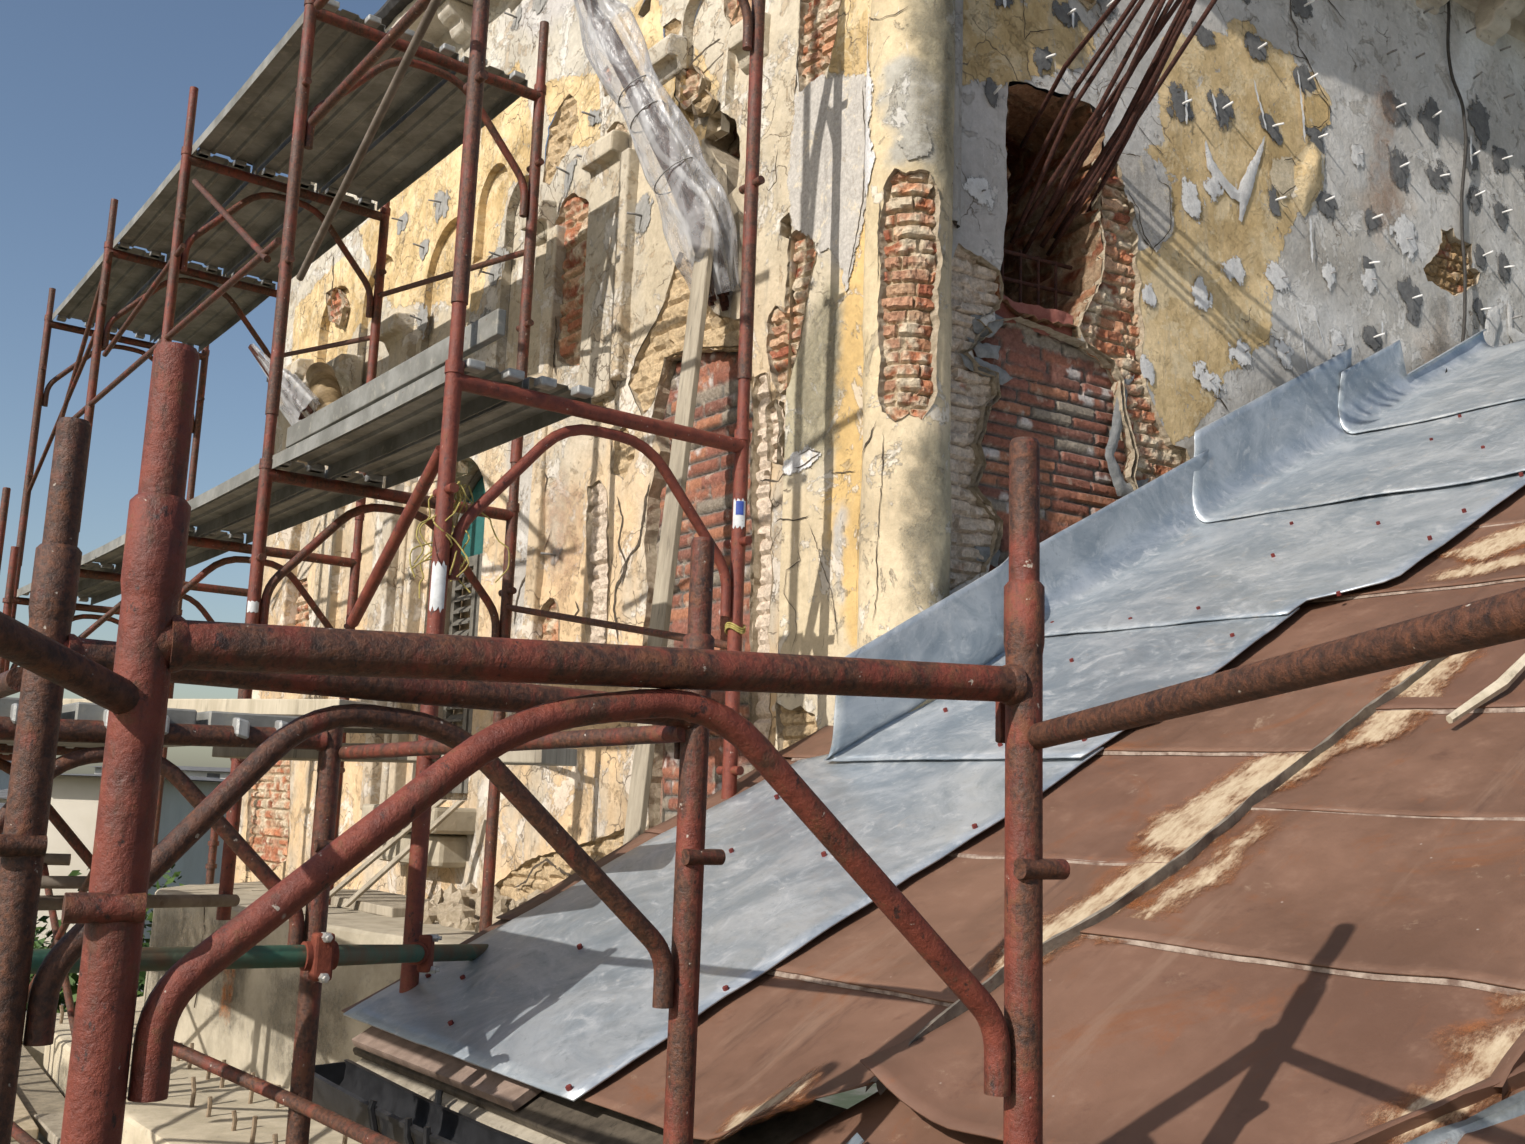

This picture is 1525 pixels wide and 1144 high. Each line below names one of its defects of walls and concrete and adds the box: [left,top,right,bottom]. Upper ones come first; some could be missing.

flaking render [543,93,578,185]
flaking render [1269,154,1296,198]
flaking render [1304,89,1331,131]
flaking render [554,193,589,366]
flaking render [629,252,693,416]
flaking render [702,305,740,353]
flaking render [749,0,1004,653]
flaking render [1072,154,1190,490]
flaking render [1423,228,1480,296]
flaking render [585,428,635,644]
crack [575,479,651,644]